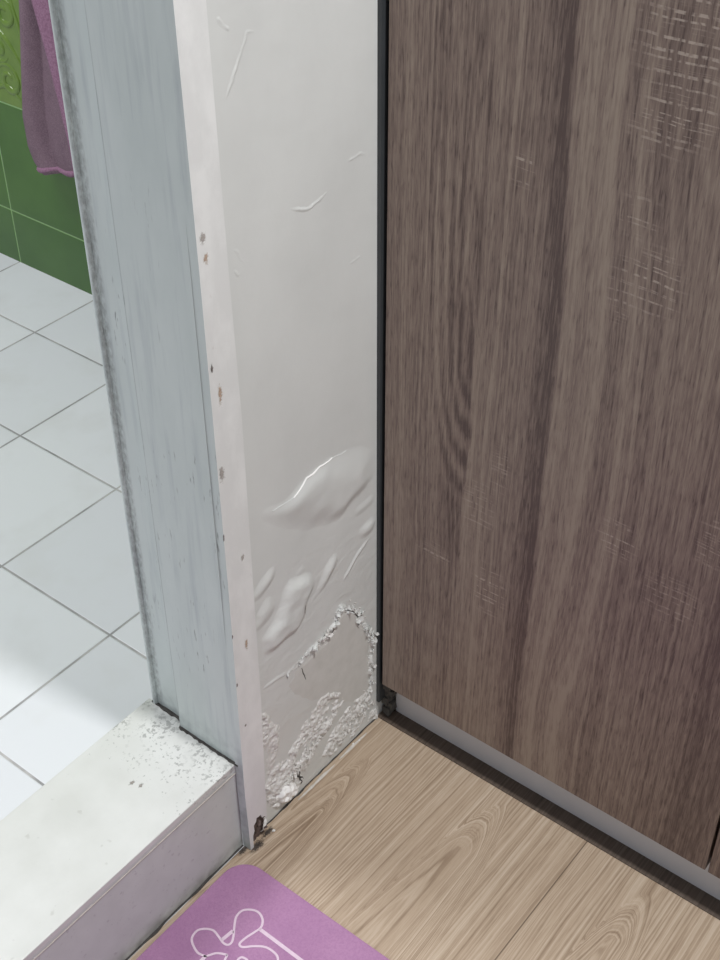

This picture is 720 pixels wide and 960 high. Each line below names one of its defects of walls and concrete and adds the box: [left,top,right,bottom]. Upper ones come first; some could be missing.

peeling [287,599,379,703]